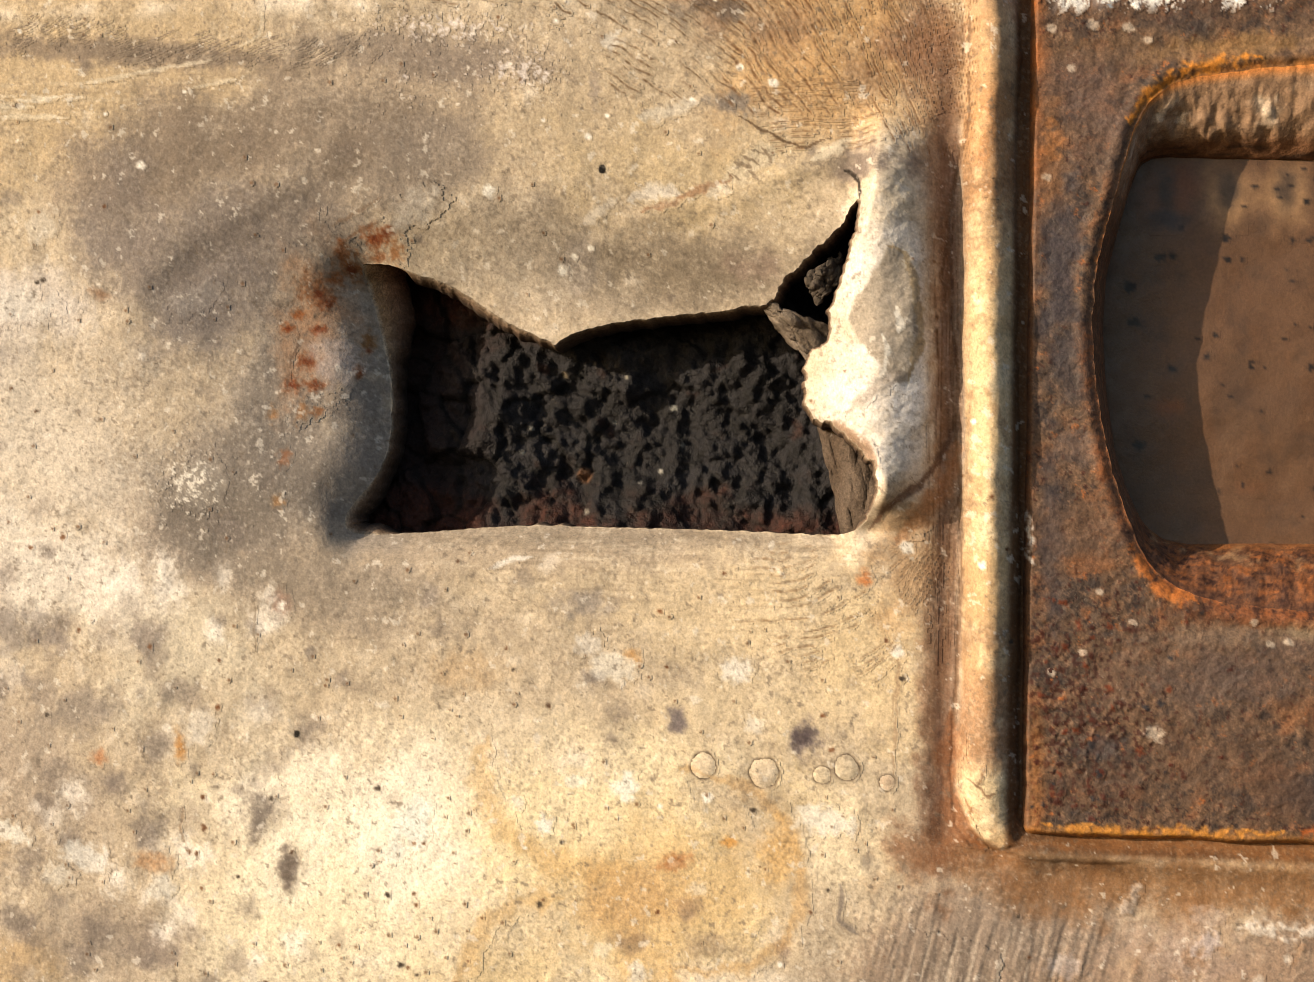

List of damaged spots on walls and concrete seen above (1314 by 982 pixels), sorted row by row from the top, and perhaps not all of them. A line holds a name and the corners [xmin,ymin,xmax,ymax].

rust [1122,49,1265,128]
peeling [579,176,734,227]
peeling [809,138,854,163]
rust [1036,115,1069,163]
rust [1162,157,1210,215]
rust [1091,209,1111,274]
rust [253,204,415,472]
peeling [841,241,928,416]
rust [1127,542,1205,627]
rust [1015,714,1314,875]
damp [450,733,817,982]
rust [386,916,438,947]